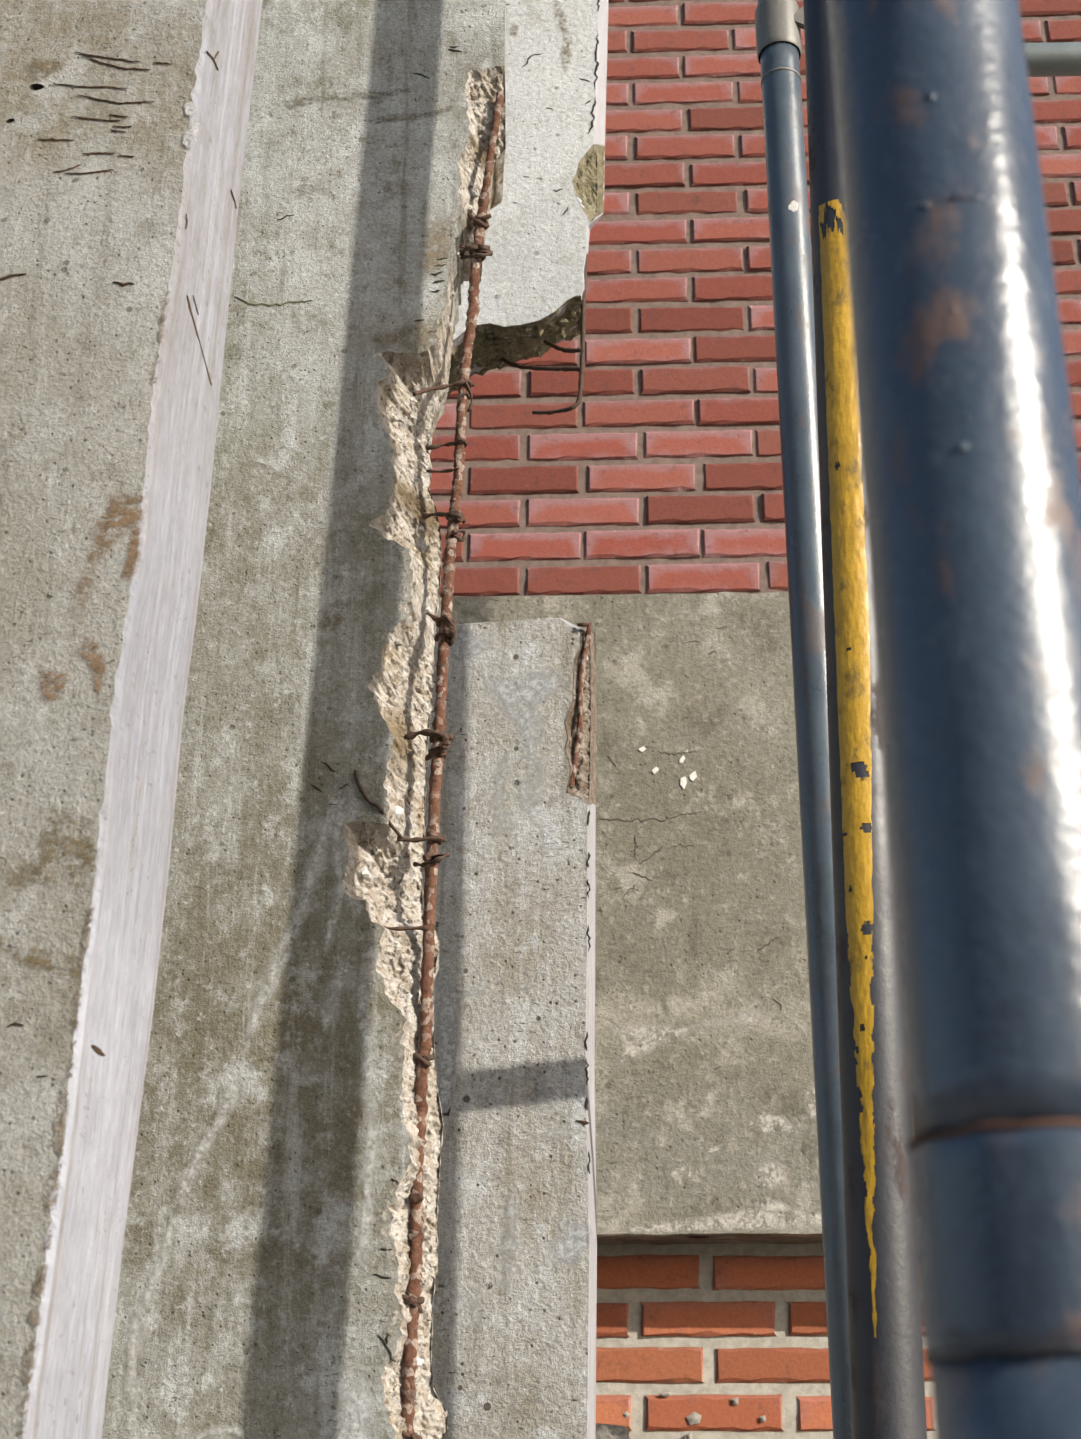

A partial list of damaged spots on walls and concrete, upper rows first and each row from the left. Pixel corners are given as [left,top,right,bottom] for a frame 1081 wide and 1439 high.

spalling [573,144,605,222]
rust [90,495,143,577]
rust [82,638,105,690]
spalling [340,66,583,1439]